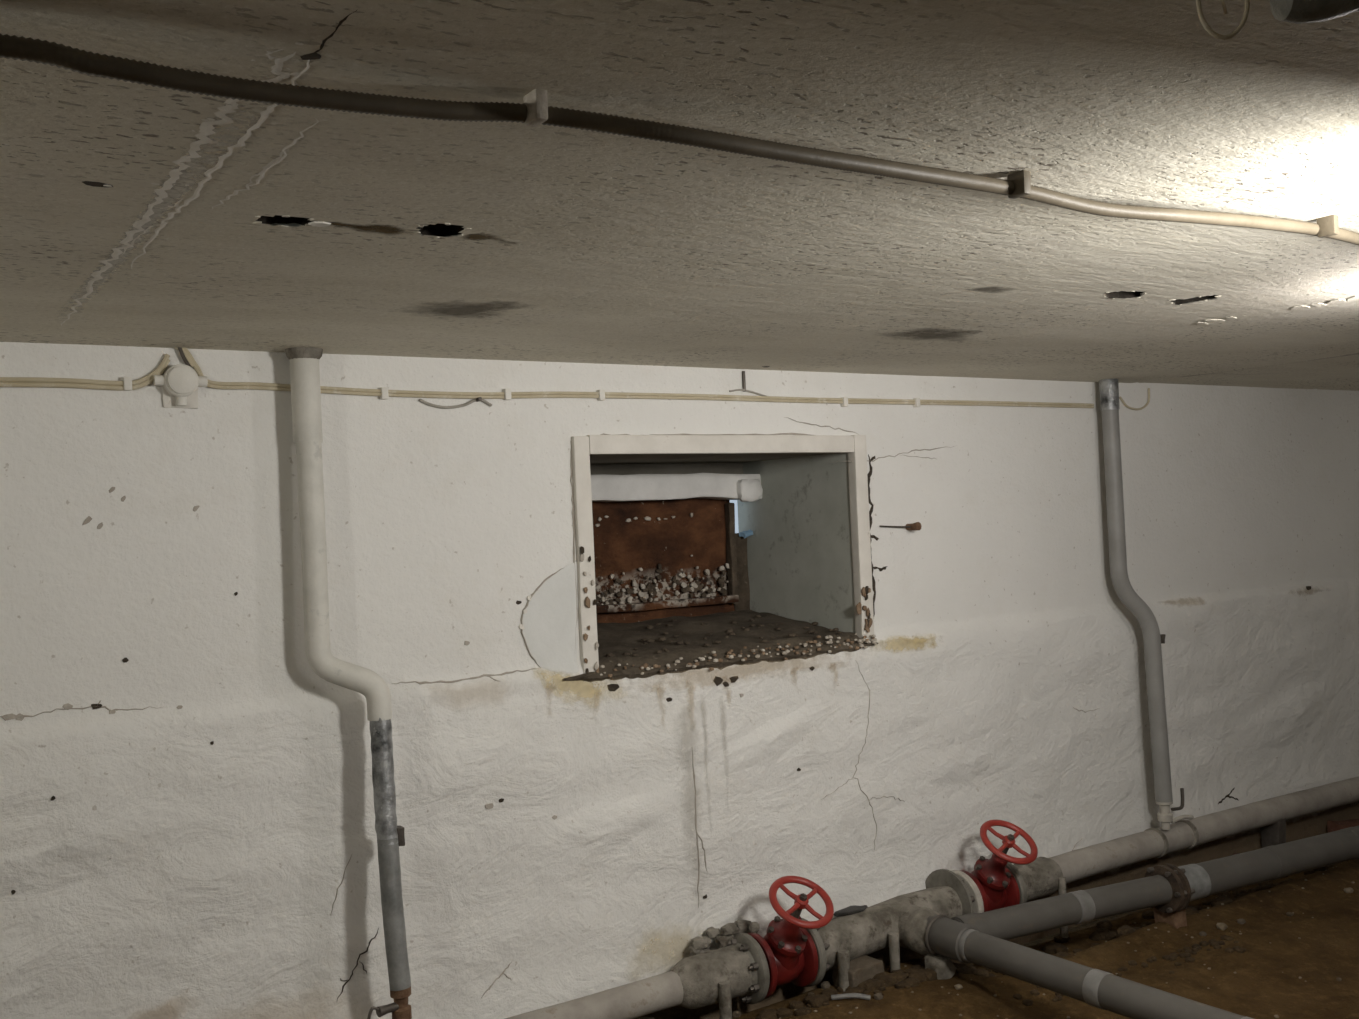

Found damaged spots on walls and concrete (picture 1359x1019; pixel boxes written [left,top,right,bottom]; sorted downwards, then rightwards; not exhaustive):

crack [820,661,905,849]
crack [337,928,379,999]